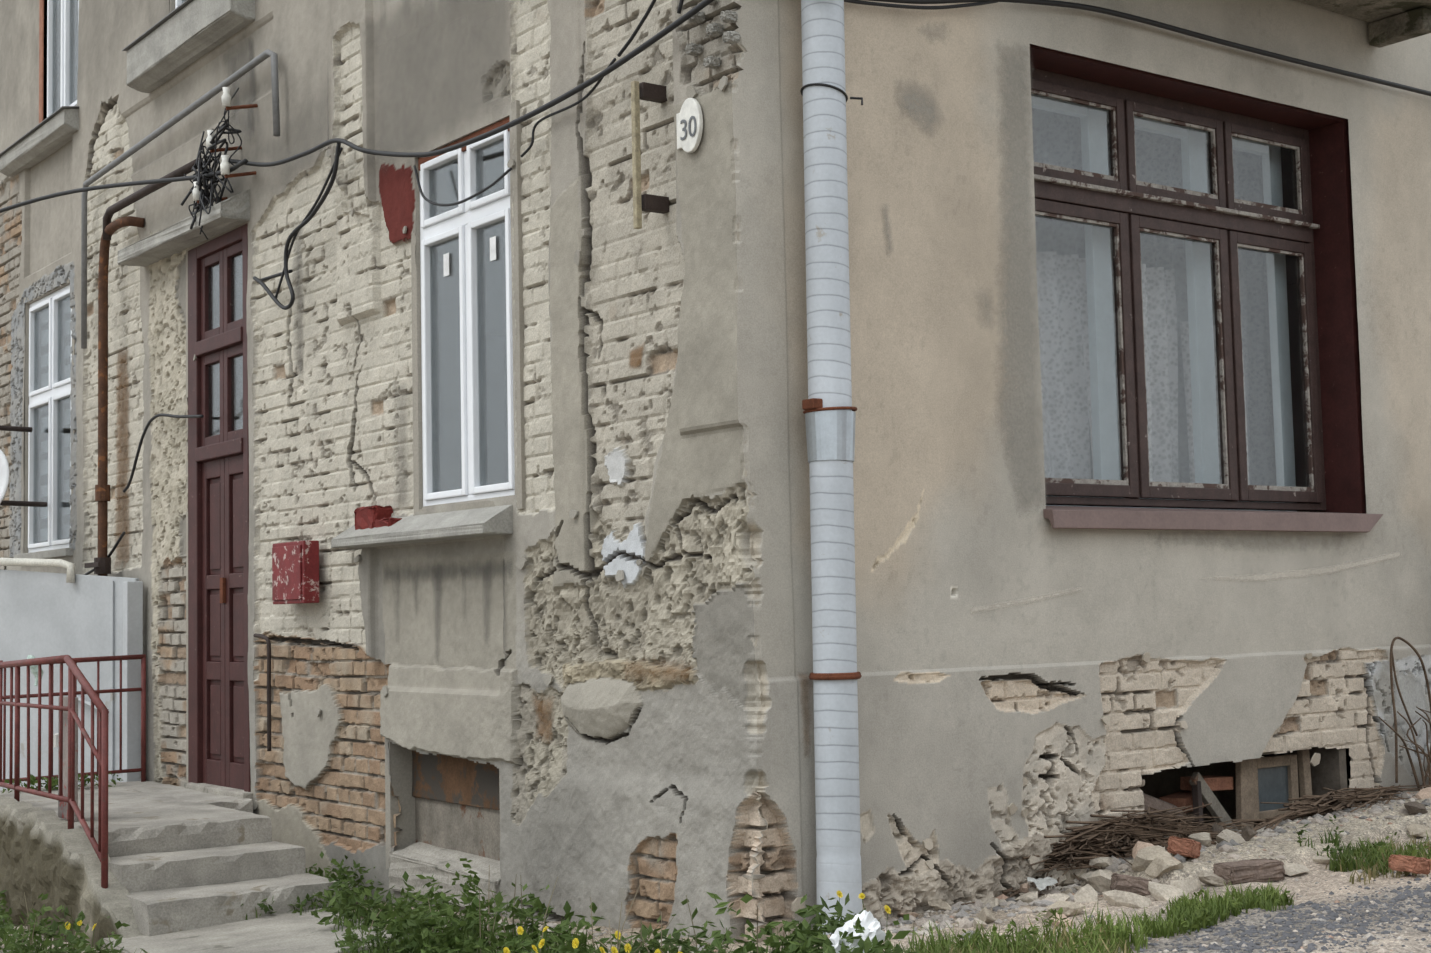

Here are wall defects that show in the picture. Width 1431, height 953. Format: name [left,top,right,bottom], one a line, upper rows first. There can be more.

rust [117,358,127,557]
crack [286,301,298,406]
flaking render [250,20,423,853]
crack [346,309,377,499]
flaking render [481,0,763,825]
crack [536,42,737,644]
flaking render [618,832,678,931]
spalling [743,637,772,733]
flaking render [726,770,805,942]
flaking render [860,652,1227,921]
flaking render [1261,647,1431,803]